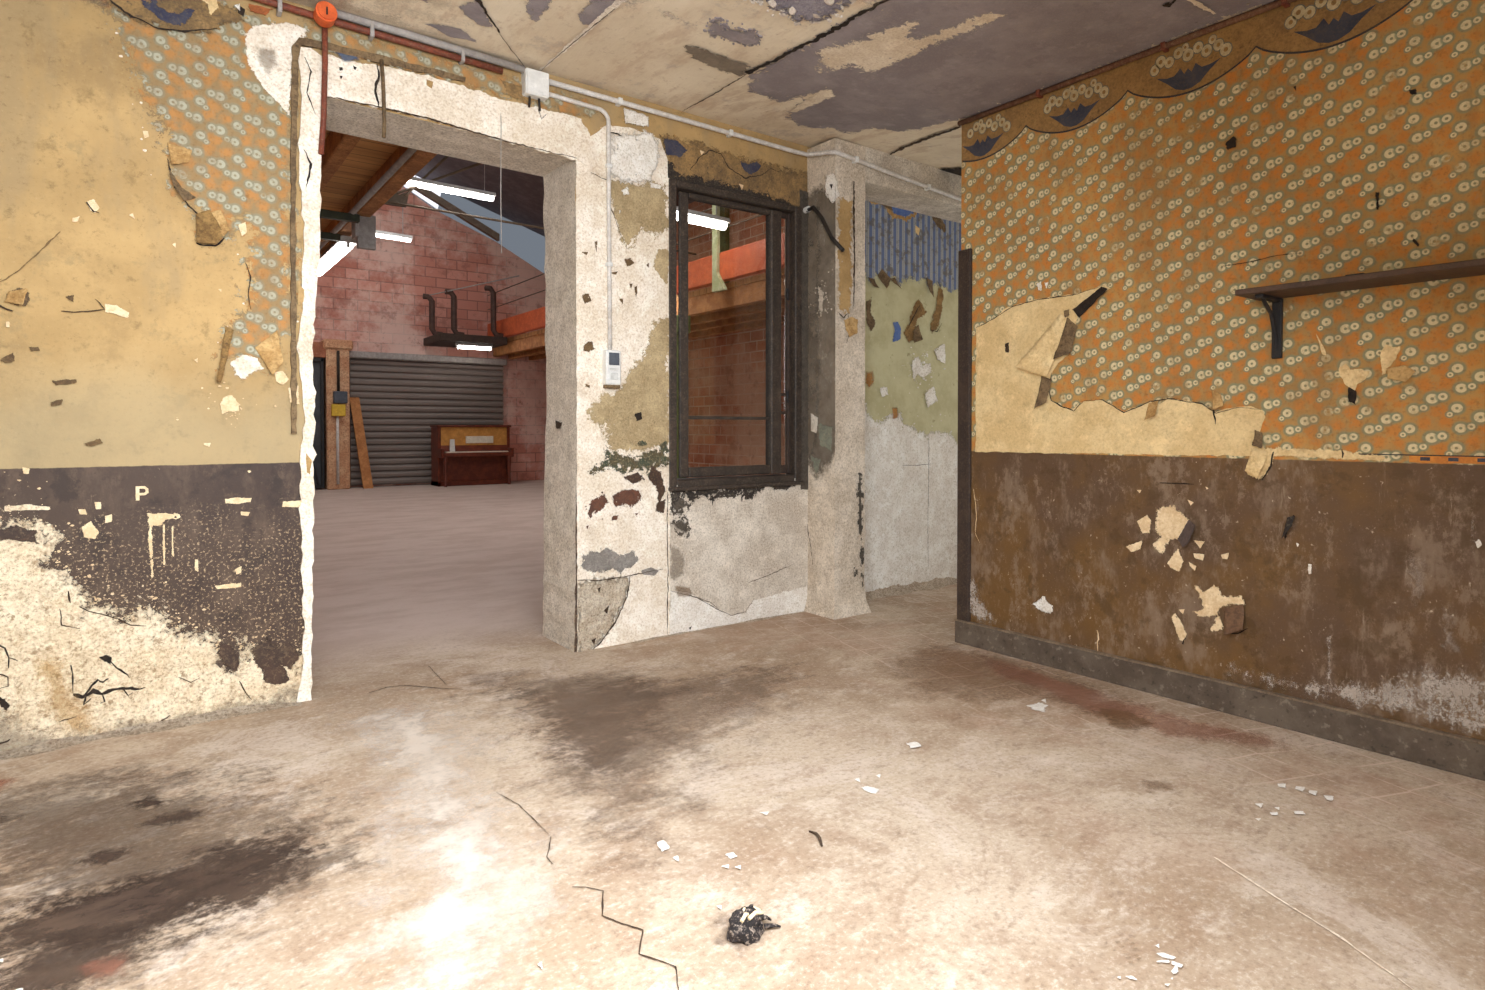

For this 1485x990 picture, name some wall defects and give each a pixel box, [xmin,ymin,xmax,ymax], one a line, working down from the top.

peeling [426,1,493,42]
peeling [526,0,552,22]
peeling [578,0,615,25]
peeling [684,0,1276,133]
flaking render [0,22,834,751]
peeling [1126,482,1248,645]
water stain [1231,665,1485,732]
water stain [135,797,200,825]
water stain [0,828,314,990]
crack [500,794,679,990]